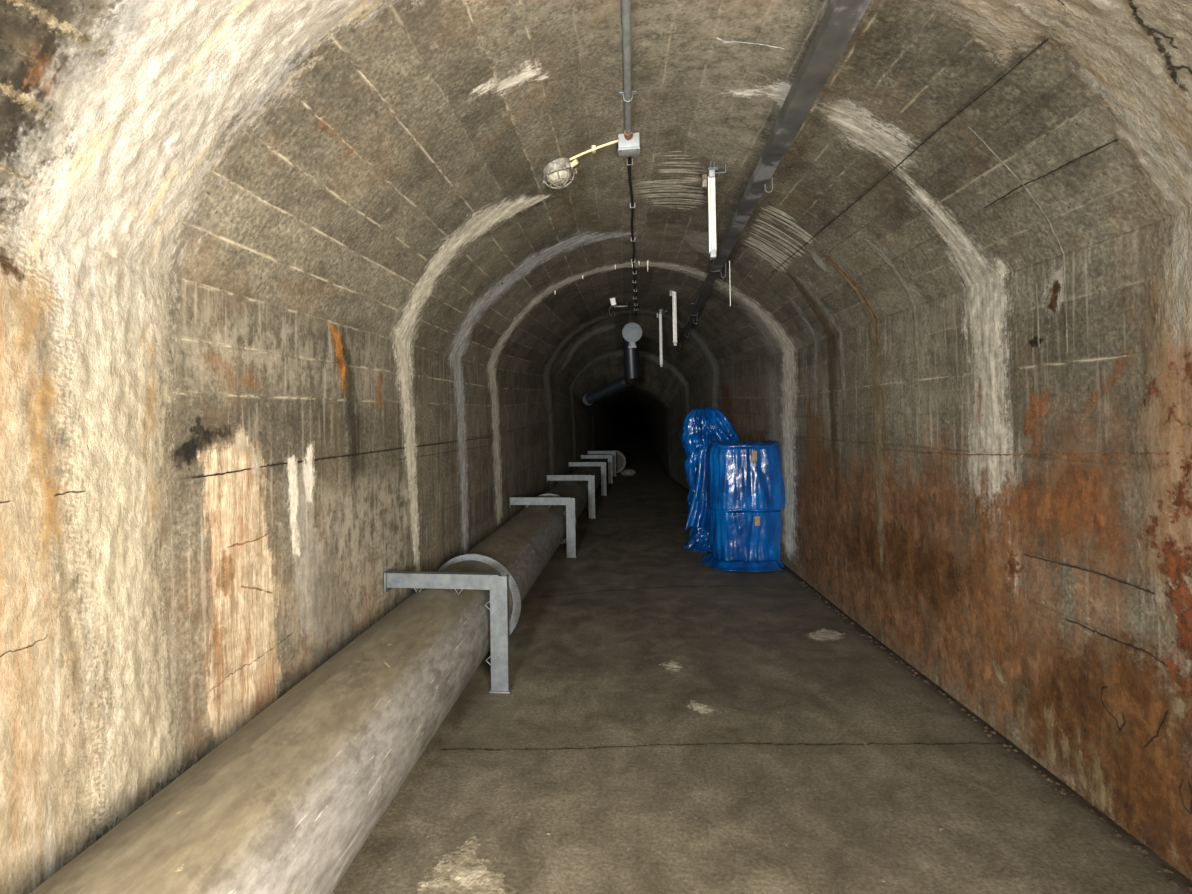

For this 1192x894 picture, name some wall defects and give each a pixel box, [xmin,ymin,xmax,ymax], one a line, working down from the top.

crack [1128,0,1192,92]
rust [330,325,346,390]
water stain [910,0,1192,639]
rust [1043,268,1065,313]
rust [1144,353,1192,429]
water stain [0,0,423,894]
crack [1025,554,1155,594]
rust [795,387,1192,881]
crack [1068,620,1191,677]